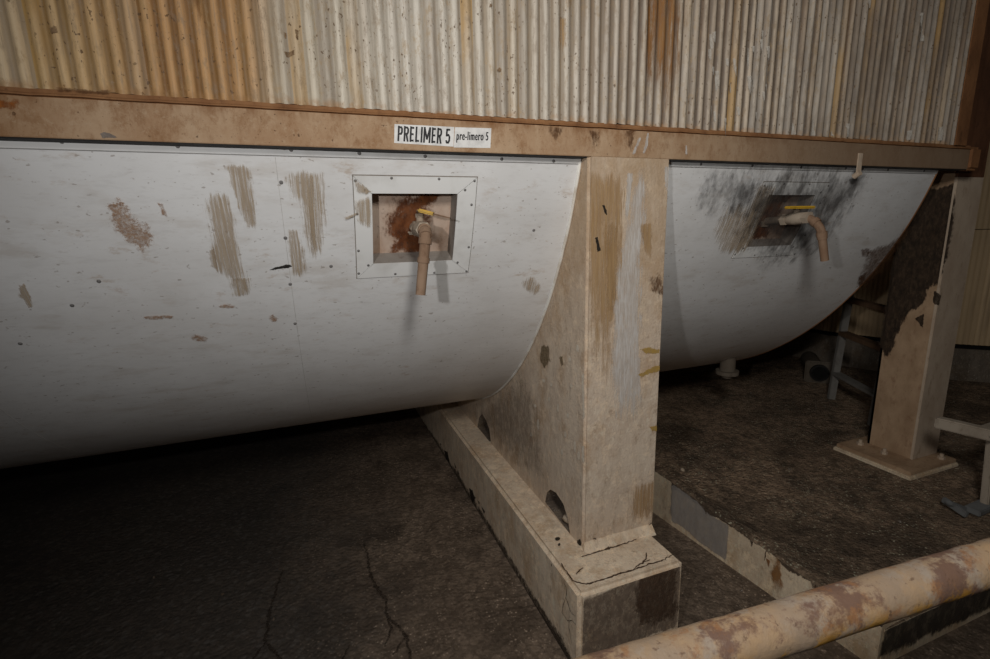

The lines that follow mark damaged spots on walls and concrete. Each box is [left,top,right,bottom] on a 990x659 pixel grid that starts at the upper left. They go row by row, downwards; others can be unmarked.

corrosion [0,86,972,150]
corrosion [387,194,438,253]
crack [363,544,412,659]
crack [561,523,673,643]
corrosion [766,558,782,586]